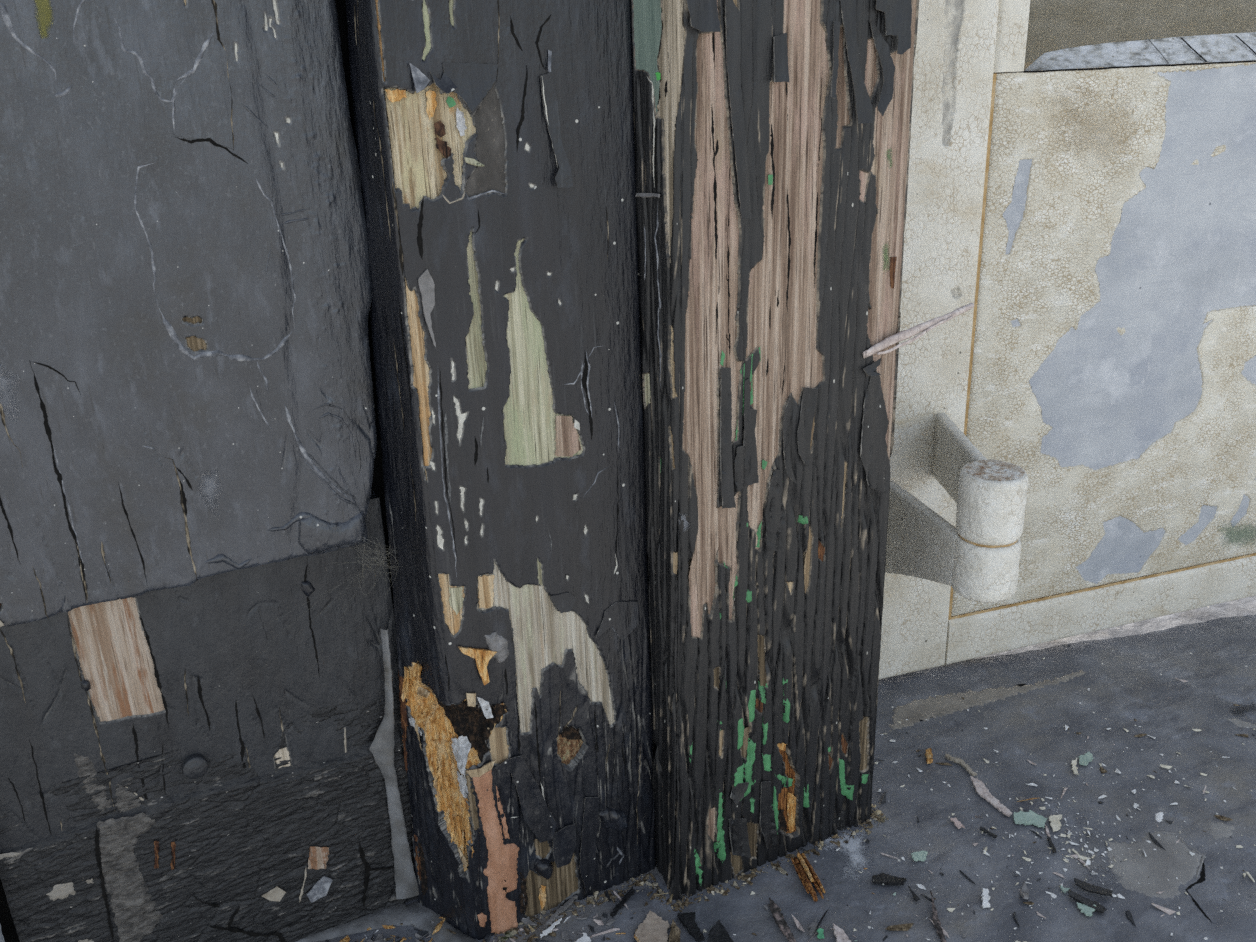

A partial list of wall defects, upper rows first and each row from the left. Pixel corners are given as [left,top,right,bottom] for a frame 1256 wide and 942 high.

crack [0,403,23,467]
crack [0,497,49,619]
crack [29,361,111,600]
peeling [46,597,169,942]
crack [119,487,148,586]
crack [172,0,234,151]
peeling [392,180,437,480]
peeling [409,0,506,389]
peeling [438,559,639,764]
peeling [495,239,583,466]
peeling [633,0,917,638]
peeling [1029,64,1256,470]